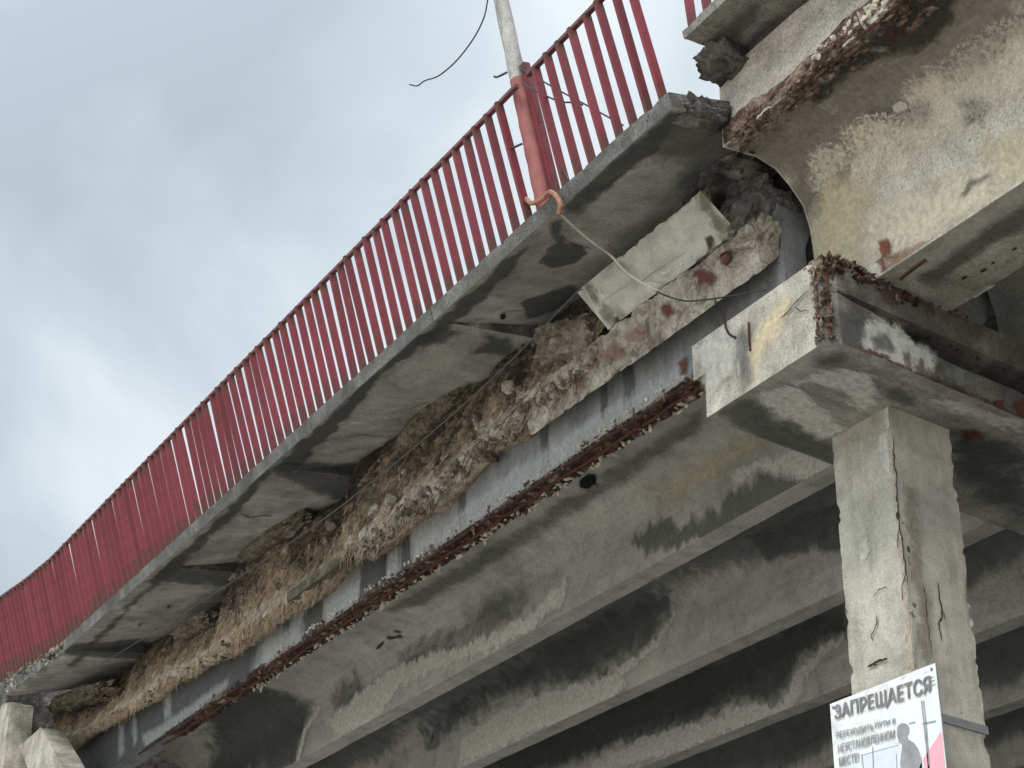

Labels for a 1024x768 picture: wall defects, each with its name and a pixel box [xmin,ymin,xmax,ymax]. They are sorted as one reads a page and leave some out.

spalling [722,0,940,154]
damp [522,286,576,319]
rust [660,304,673,317]
rust [693,269,715,284]
spalling [803,241,968,346]
rust [876,239,905,306]
spalling [50,220,779,755]
damp [632,300,936,559]
crack [844,439,945,667]
damp [933,400,1024,511]
damp [210,579,568,768]
damp [421,595,844,768]